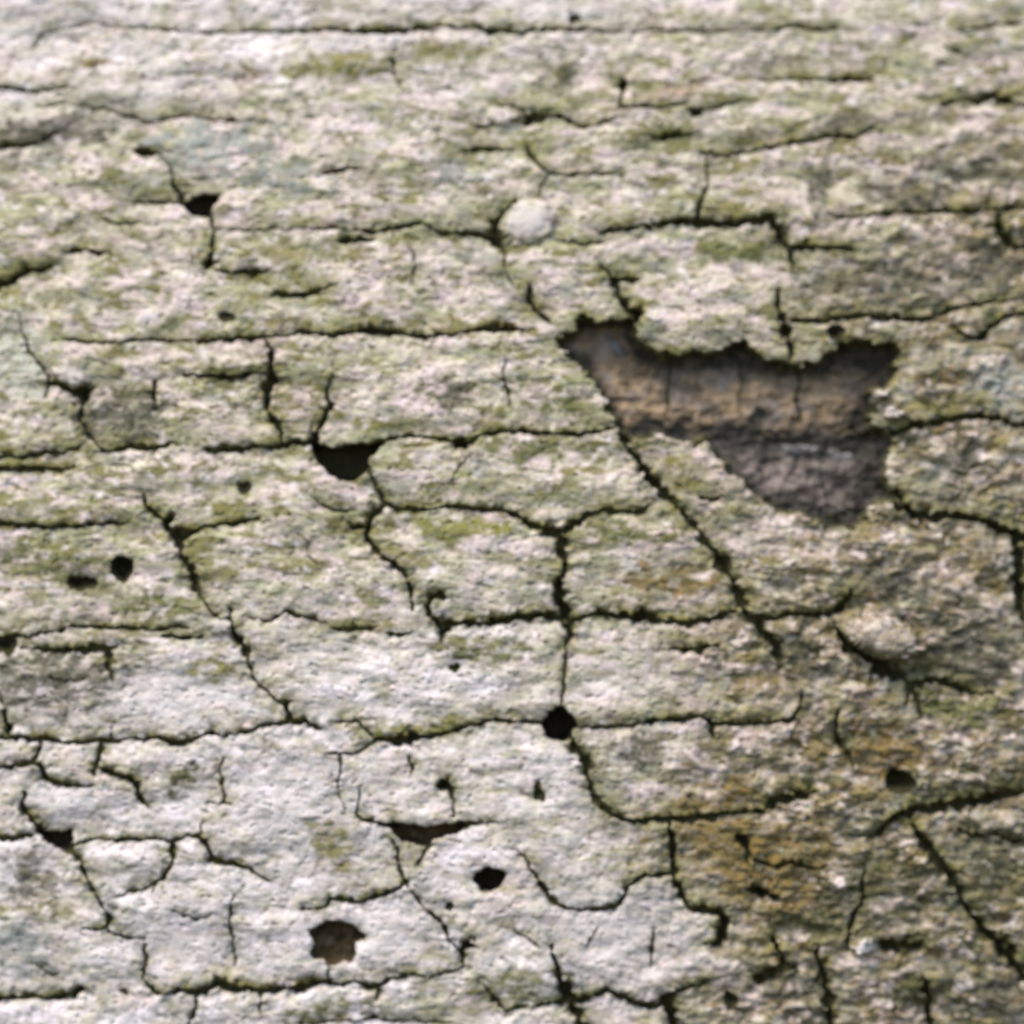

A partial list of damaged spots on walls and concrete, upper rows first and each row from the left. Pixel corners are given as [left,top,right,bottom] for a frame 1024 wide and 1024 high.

crack [0,85,265,226]
crack [0,248,111,290]
crack [63,76,1024,455]
crack [0,314,180,474]
spalling [557,312,906,531]
crack [893,489,1024,622]
crack [0,362,994,1024]
crack [848,788,1024,982]